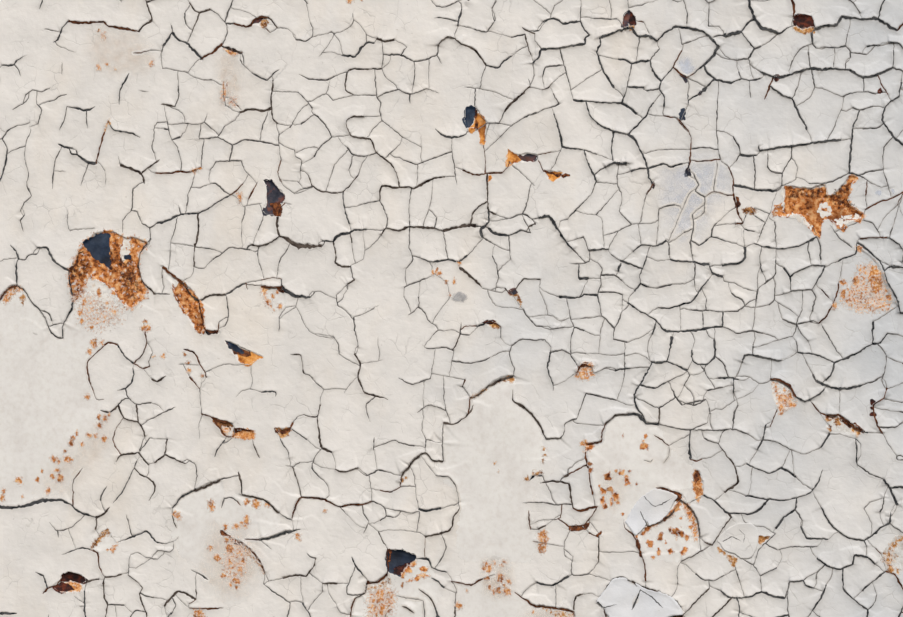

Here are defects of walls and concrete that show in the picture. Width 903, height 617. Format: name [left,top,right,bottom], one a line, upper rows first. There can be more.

crack [0,88,139,230]
peeling [262,179,285,216]
peeling [164,272,212,336]
rust [831,245,896,316]
peeling [0,228,151,505]
peeling [52,571,89,594]
crack [0,470,219,617]
rust [206,498,270,591]
crack [237,404,444,617]
rust [363,576,401,617]
peeling [353,549,442,617]
crack [515,452,659,615]